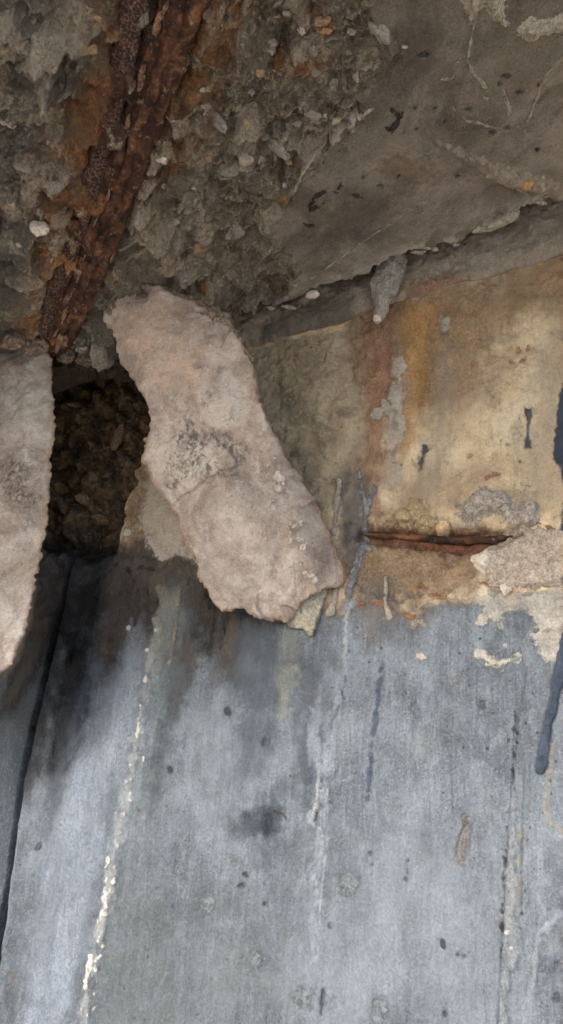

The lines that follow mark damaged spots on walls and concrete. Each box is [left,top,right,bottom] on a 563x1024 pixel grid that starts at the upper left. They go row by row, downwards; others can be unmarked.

spalling [0,0,102,321]
rust [17,0,246,357]
spalling [127,0,408,278]
crack [305,183,362,228]
spalling [73,338,115,372]
damp [338,474,477,643]
rust [362,530,513,565]
peeling [474,643,522,668]
spalling [470,525,563,663]
damp [0,463,281,1024]
damp [240,788,292,856]
damp [300,702,335,845]